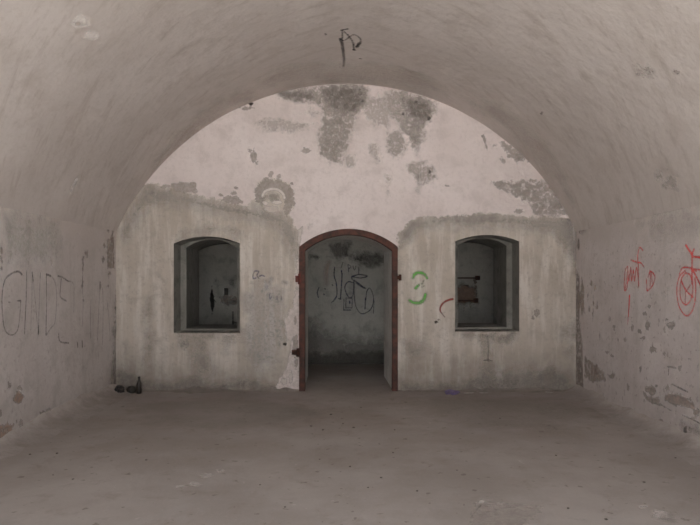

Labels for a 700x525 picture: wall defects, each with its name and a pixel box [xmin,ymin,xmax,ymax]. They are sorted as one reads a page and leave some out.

damp [279,84,436,166]
damp [408,162,435,185]
flaking render [493,179,567,217]
flaking render [276,251,299,389]
spalling [576,273,614,387]
flaking render [643,384,699,433]